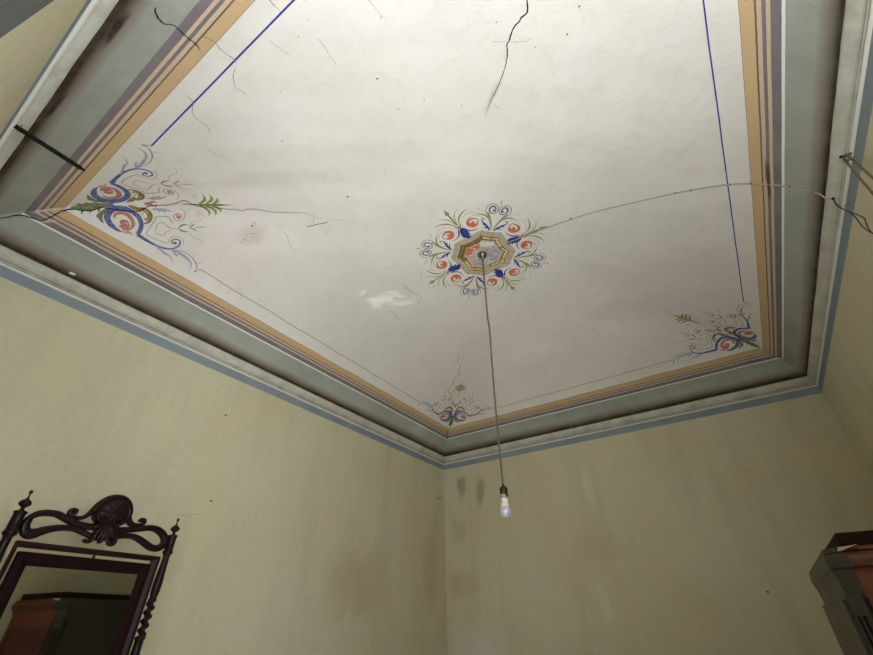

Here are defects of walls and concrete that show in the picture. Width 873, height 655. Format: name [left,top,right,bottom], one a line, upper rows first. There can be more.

crack [154,7,246,95]
crack [485,0,528,116]
crack [0,200,322,251]